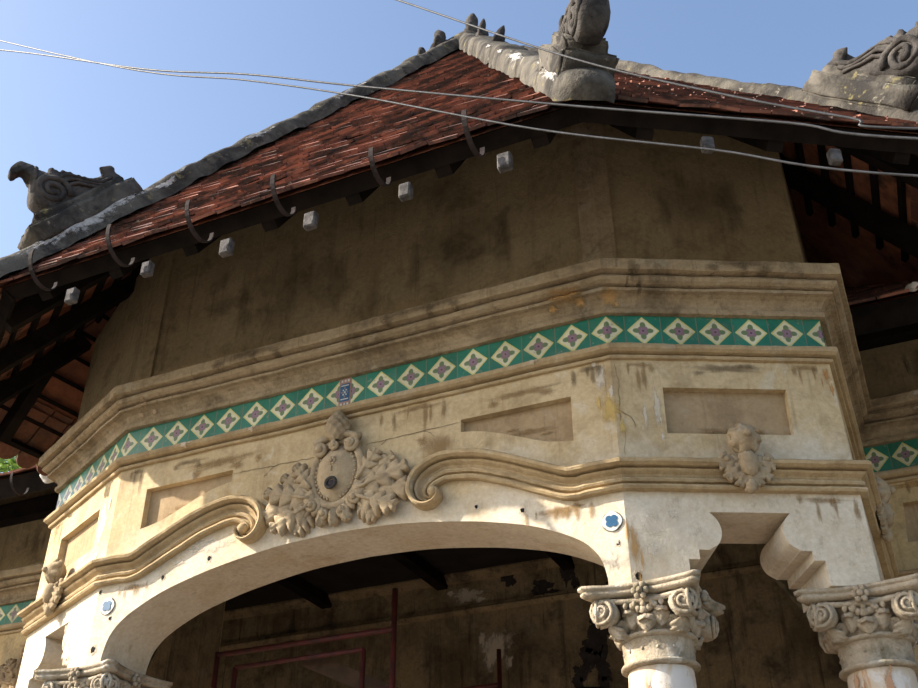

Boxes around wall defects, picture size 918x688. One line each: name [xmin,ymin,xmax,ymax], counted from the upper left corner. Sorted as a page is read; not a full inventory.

crack [369,422,458,445]
crack [614,365,636,452]
peeling [571,618,613,688]
peeling [885,665,896,688]